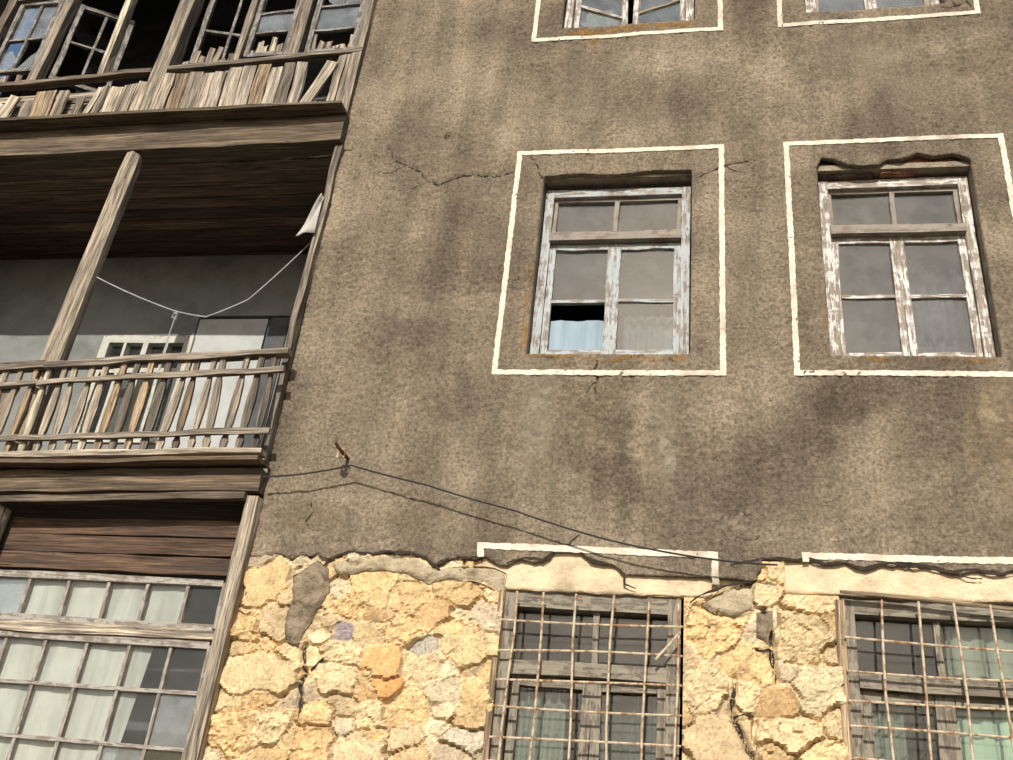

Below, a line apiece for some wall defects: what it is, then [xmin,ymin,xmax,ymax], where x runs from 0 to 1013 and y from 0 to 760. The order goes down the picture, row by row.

crack [378,147,549,189]
spalling [817,156,960,181]
spalling [332,556,507,592]
crack [755,631,776,683]
crack [297,646,325,726]
crack [730,683,754,760]